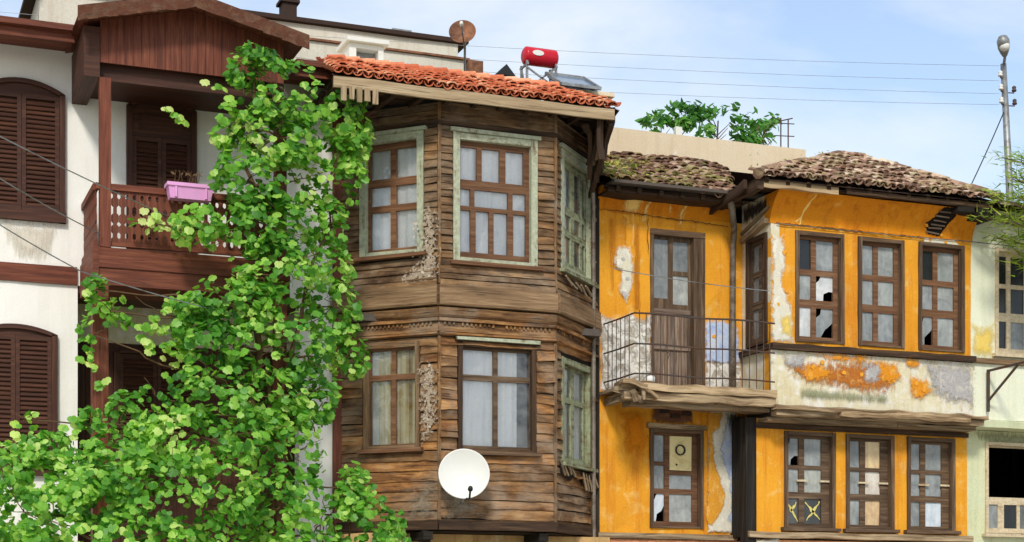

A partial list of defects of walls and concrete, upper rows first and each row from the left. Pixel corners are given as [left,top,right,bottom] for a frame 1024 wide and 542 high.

peeling [402,206,441,284]
peeling [416,361,442,444]
peeling [600,247,651,390]
peeling [705,321,740,363]
peeling [771,237,793,343]
peeling [788,353,933,399]
peeling [668,412,737,542]